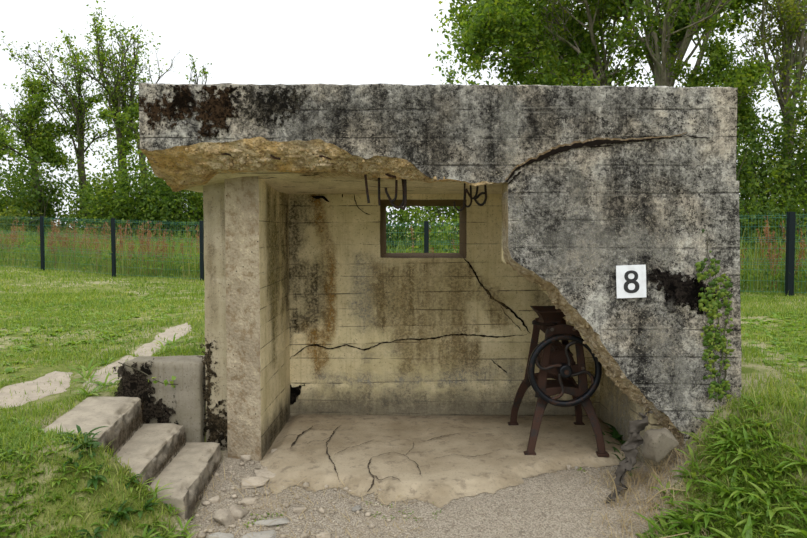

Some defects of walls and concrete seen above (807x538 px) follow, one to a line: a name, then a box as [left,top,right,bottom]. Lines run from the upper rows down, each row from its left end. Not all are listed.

crack [505,132,711,185]
water stain [267,189,326,362]
crack [290,257,530,359]
spalling [141,137,684,454]
crack [285,426,490,492]